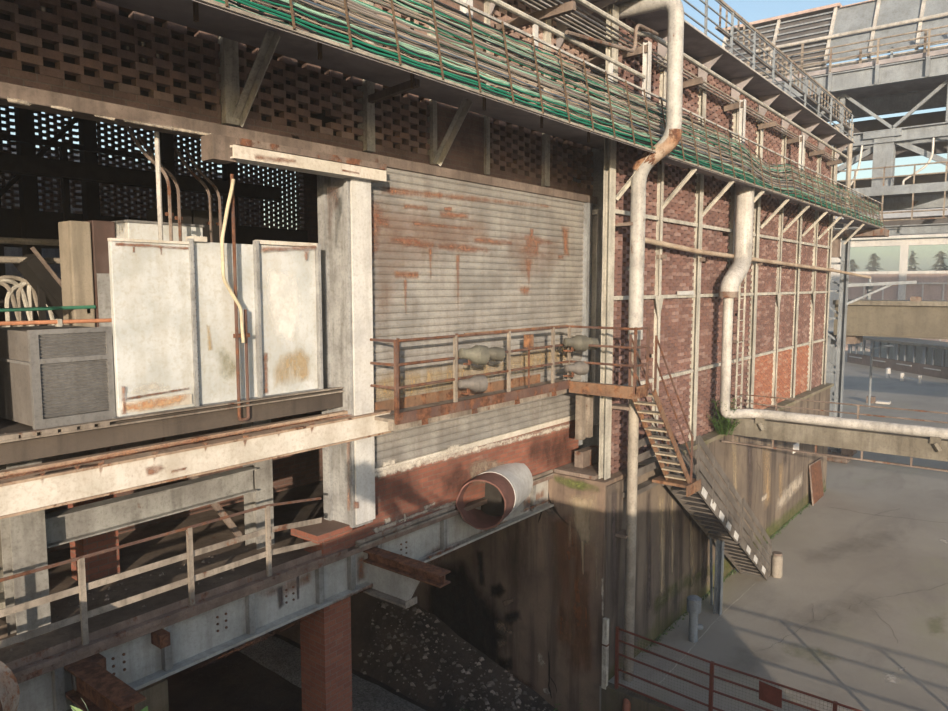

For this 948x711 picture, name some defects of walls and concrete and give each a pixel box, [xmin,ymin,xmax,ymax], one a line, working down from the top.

rust [371,203,388,254]
rust [390,188,511,276]
rust [122,387,186,414]
rust [73,450,138,470]
rust [147,438,208,474]
water stain [734,442,752,507]
water stain [570,497,593,594]